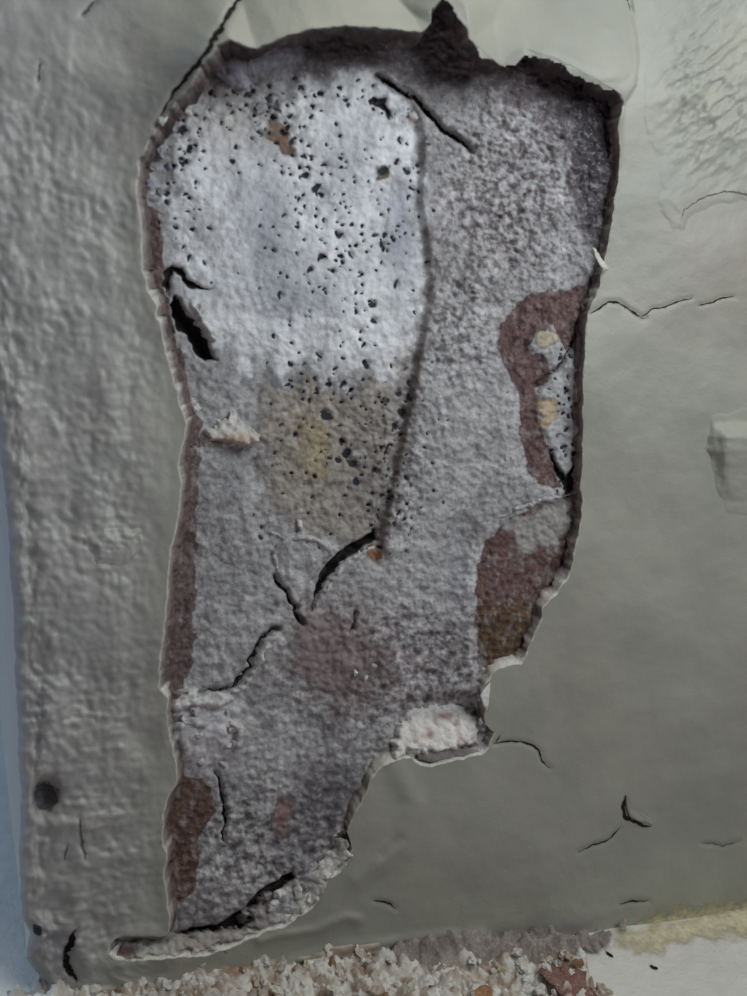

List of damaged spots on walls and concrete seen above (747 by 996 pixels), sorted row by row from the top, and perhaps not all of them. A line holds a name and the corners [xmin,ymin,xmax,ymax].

crack [156,0,241,124]
crack [591,296,734,317]
spalling [108,0,625,963]
crack [493,736,550,768]
crack [579,829,619,852]